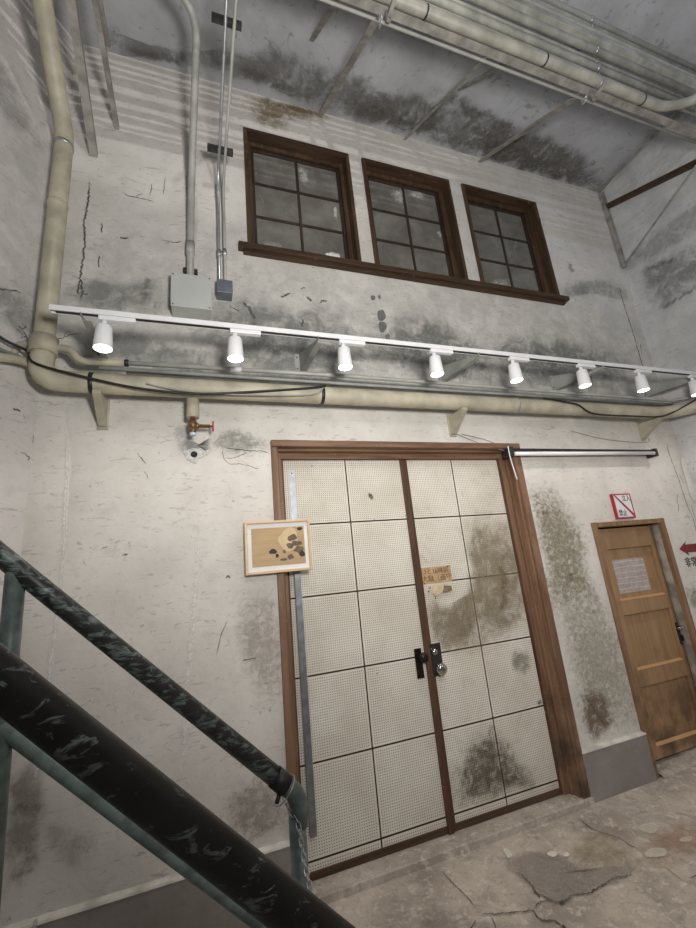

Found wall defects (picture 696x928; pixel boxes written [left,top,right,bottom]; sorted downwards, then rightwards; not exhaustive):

leakage [227,54,324,119]
leakage [339,80,593,186]
crack [77,189,103,296]
leakage [535,494,590,601]
leakage [584,694,612,736]
crack [444,872,630,928]